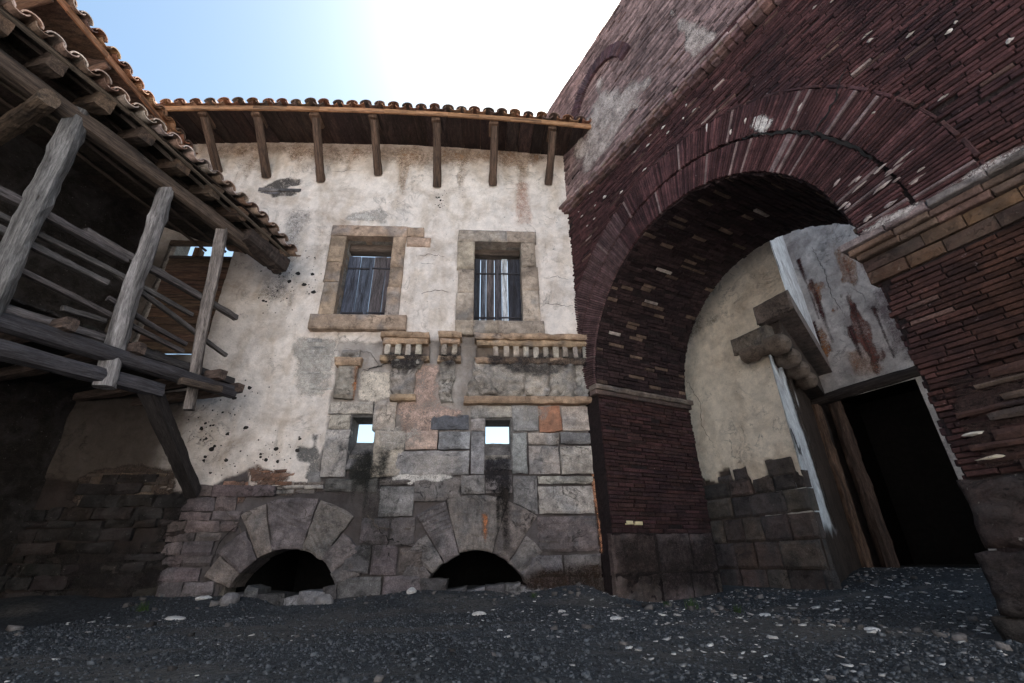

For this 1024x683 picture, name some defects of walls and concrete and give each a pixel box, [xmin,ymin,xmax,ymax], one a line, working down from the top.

flaking render [258,178,301,197]
corrosion [797,259,834,357]
corrosion [834,249,895,374]
flaking render [188,380,324,504]
damp [350,450,389,512]
damp [485,456,511,549]